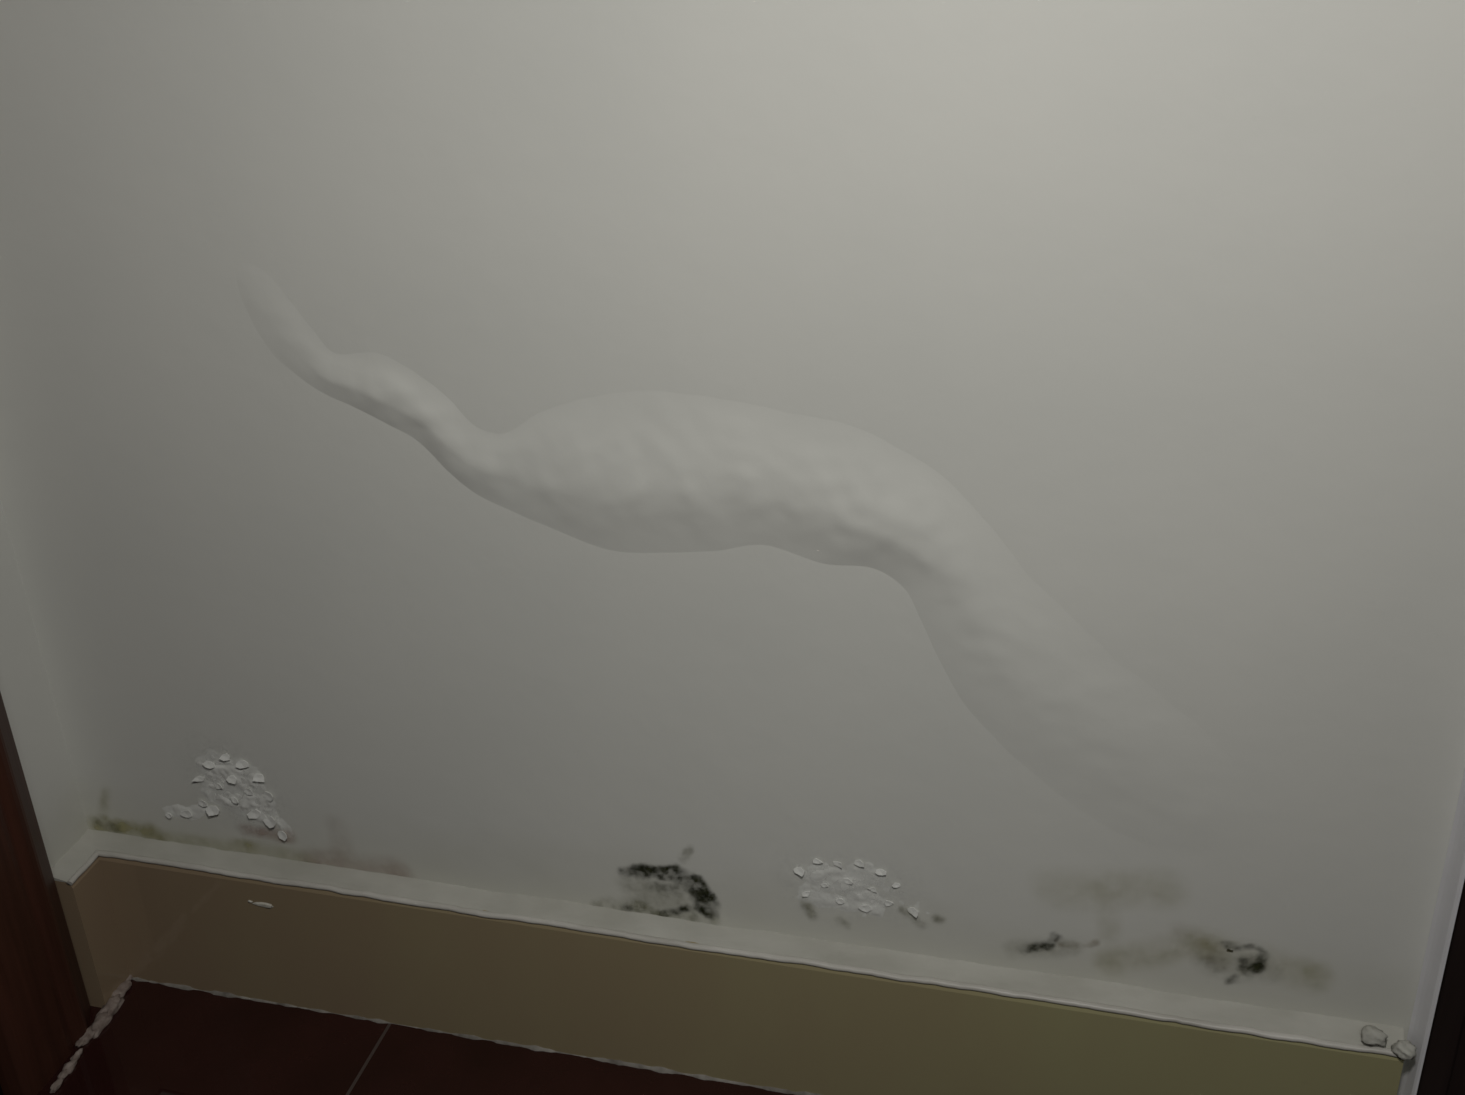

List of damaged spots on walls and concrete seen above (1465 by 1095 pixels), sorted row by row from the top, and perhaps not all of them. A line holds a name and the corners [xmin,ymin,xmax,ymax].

leakage [632,865,715,918]
leakage [1247,958,1265,973]